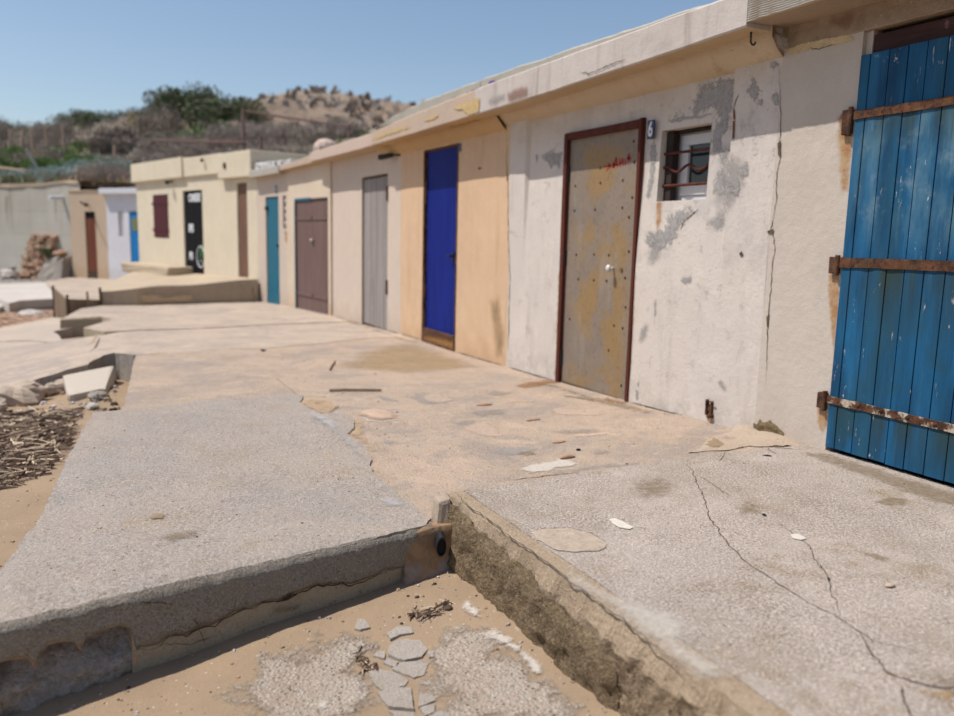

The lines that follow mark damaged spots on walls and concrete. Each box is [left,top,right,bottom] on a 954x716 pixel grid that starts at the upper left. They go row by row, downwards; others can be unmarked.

peeling [788,35,854,55]
peeling [747,78,778,105]
peeling [669,78,748,203]
peeling [645,207,696,261]
crack [765,68,781,381]
corrosion [829,275,838,329]
peeling [355,619,370,632]
crack [689,466,954,716]
spalling [0,626,137,716]
peeling [369,626,447,716]